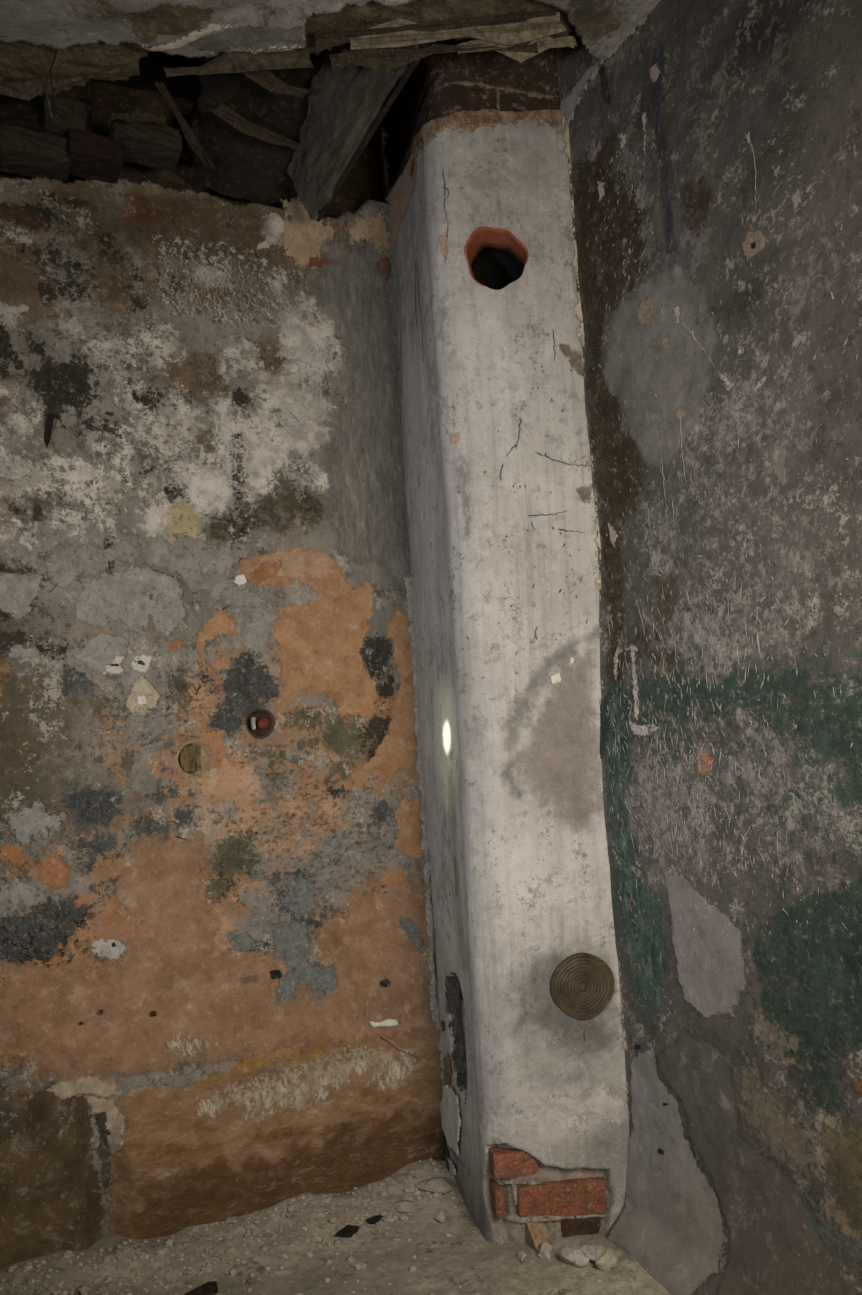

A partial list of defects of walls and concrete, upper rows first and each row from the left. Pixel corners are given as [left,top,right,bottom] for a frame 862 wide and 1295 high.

flaking render [257,38,562,283]
water stain [651,44,708,265]
water stain [24,231,302,439]
water stain [132,383,196,500]
water stain [207,433,324,542]
water stain [559,150,649,683]
flaking render [0,534,467,1194]
water stain [515,645,599,827]
peeling [600,664,862,1020]
flaking render [483,1143,616,1253]